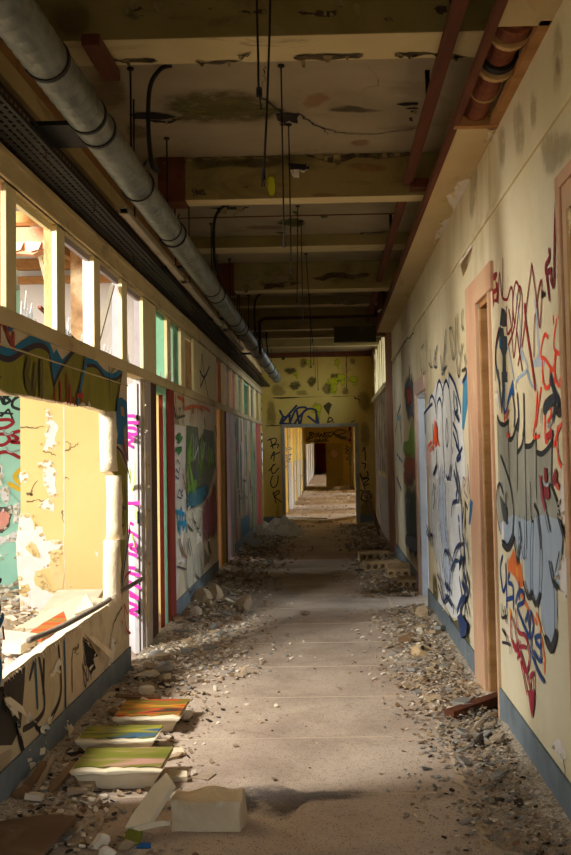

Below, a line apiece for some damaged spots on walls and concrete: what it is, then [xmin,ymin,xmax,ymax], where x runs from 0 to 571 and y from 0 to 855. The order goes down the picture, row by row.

flaking render [293,54,363,68]
leakage [171,92,273,123]
crack [297,113,413,135]
peeling [0,407,72,613]